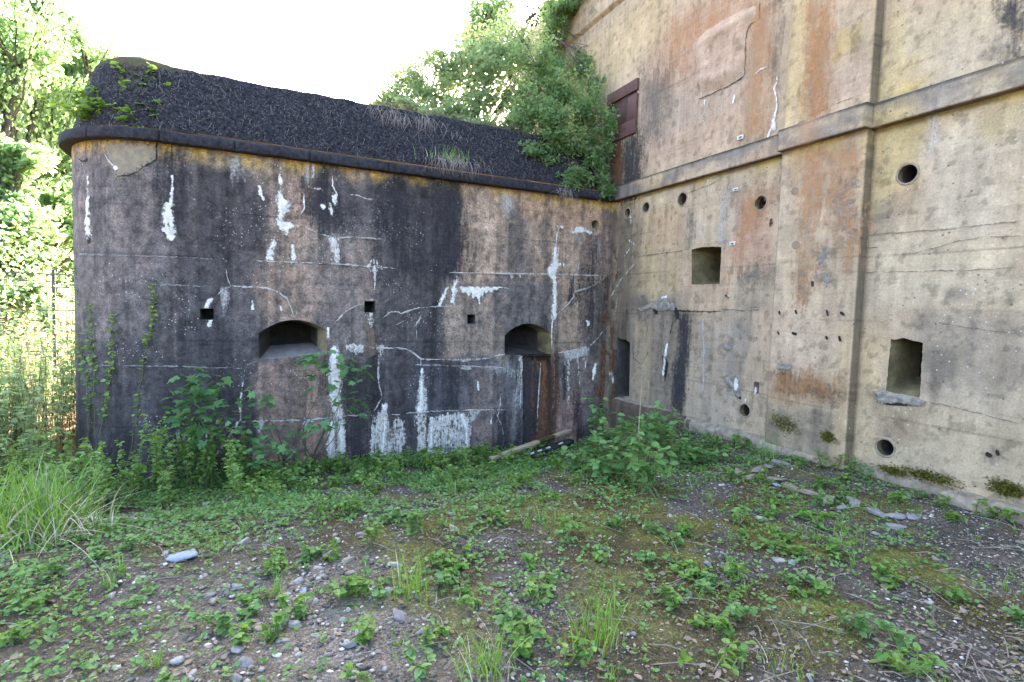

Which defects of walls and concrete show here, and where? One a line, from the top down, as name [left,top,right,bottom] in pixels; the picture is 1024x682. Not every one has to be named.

crack [699,4,760,99]
damp [767,78,778,137]
rust [805,2,833,119]
damp [152,146,188,241]
damp [320,175,472,460]
damp [489,355,523,449]
rust [515,354,560,445]
damp [660,314,705,414]